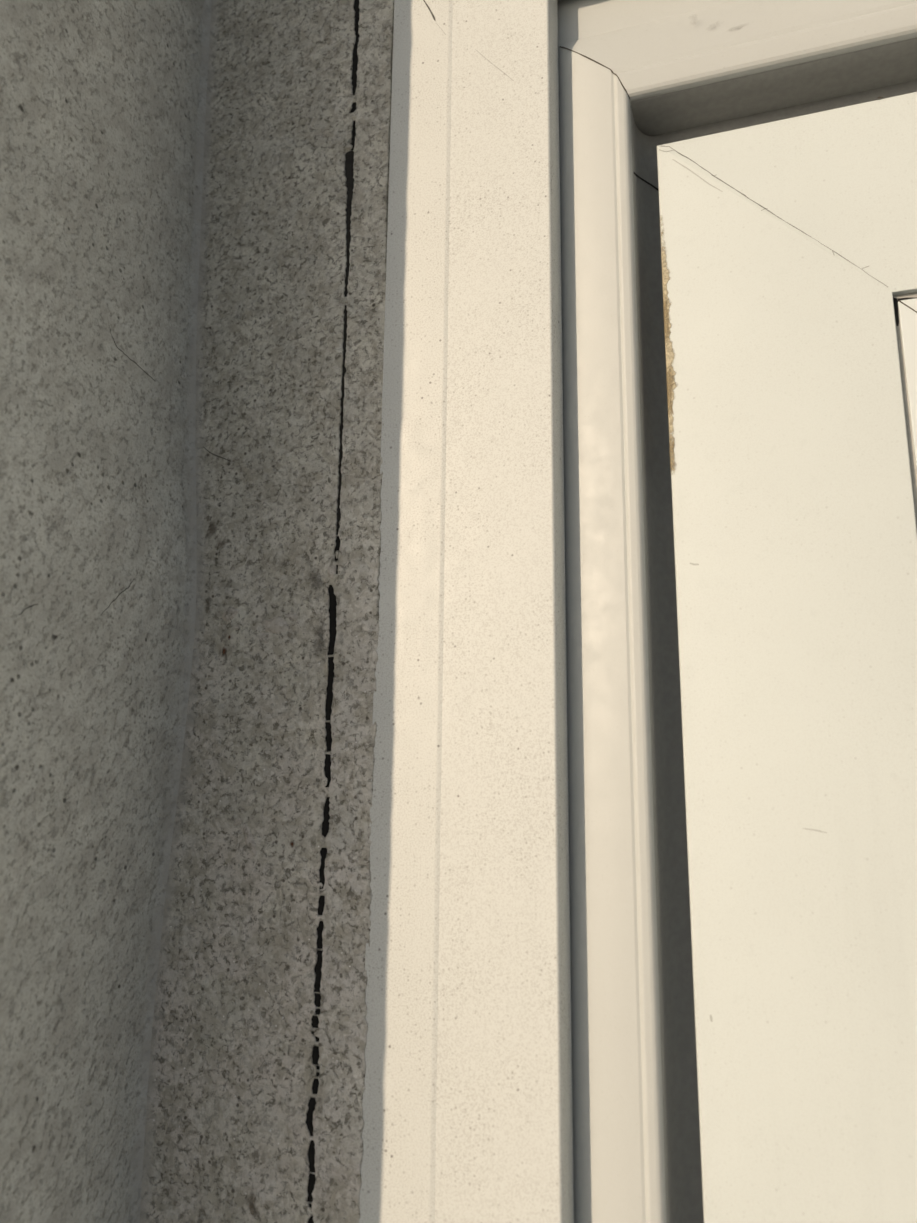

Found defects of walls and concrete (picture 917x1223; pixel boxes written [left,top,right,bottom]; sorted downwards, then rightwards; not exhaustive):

crack [306,0,360,1223]